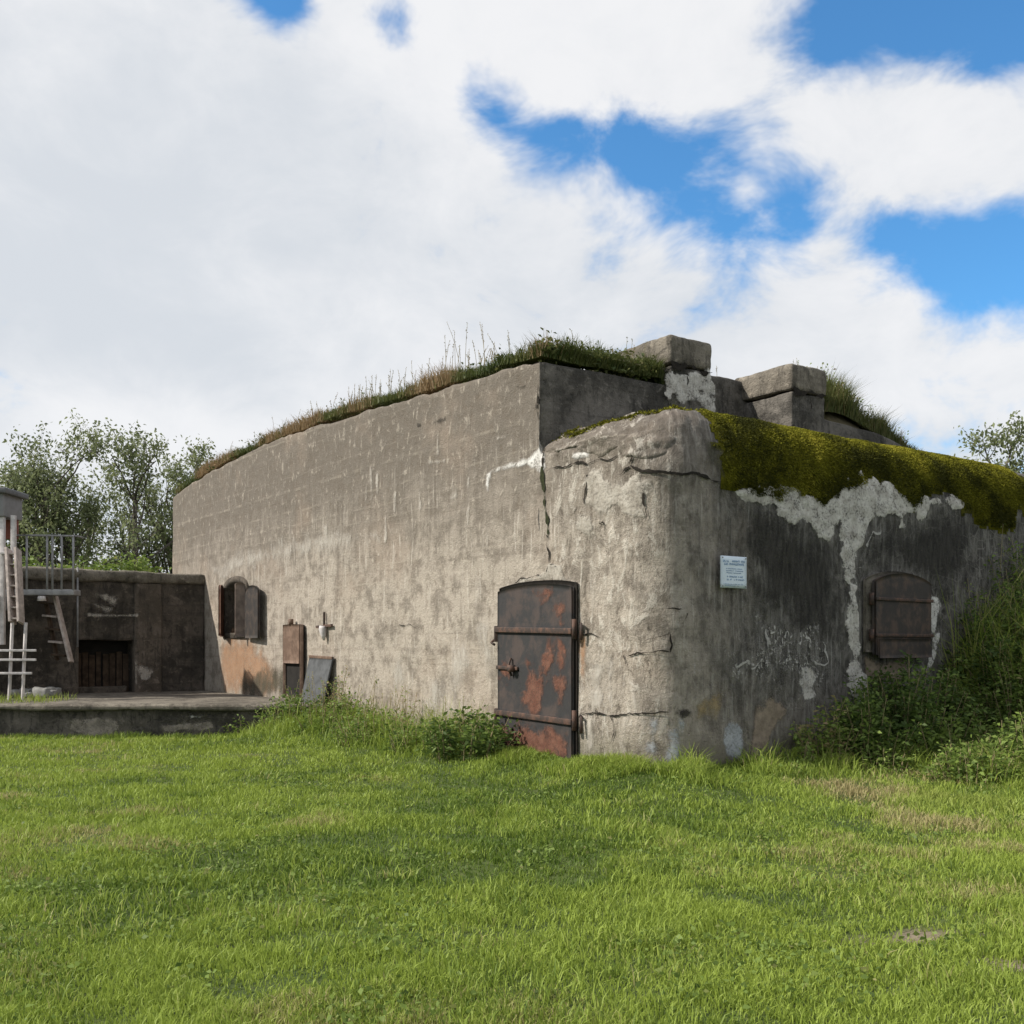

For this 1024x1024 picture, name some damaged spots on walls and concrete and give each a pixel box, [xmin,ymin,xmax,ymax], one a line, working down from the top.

peeling [664,368,716,412]
leakage [486,448,545,487]
crack [514,448,719,584]
peeling [735,470,964,701]
crack [623,608,688,664]
corrosion [522,641,565,714]
corrosion [502,725,567,757]
crack [581,710,666,755]